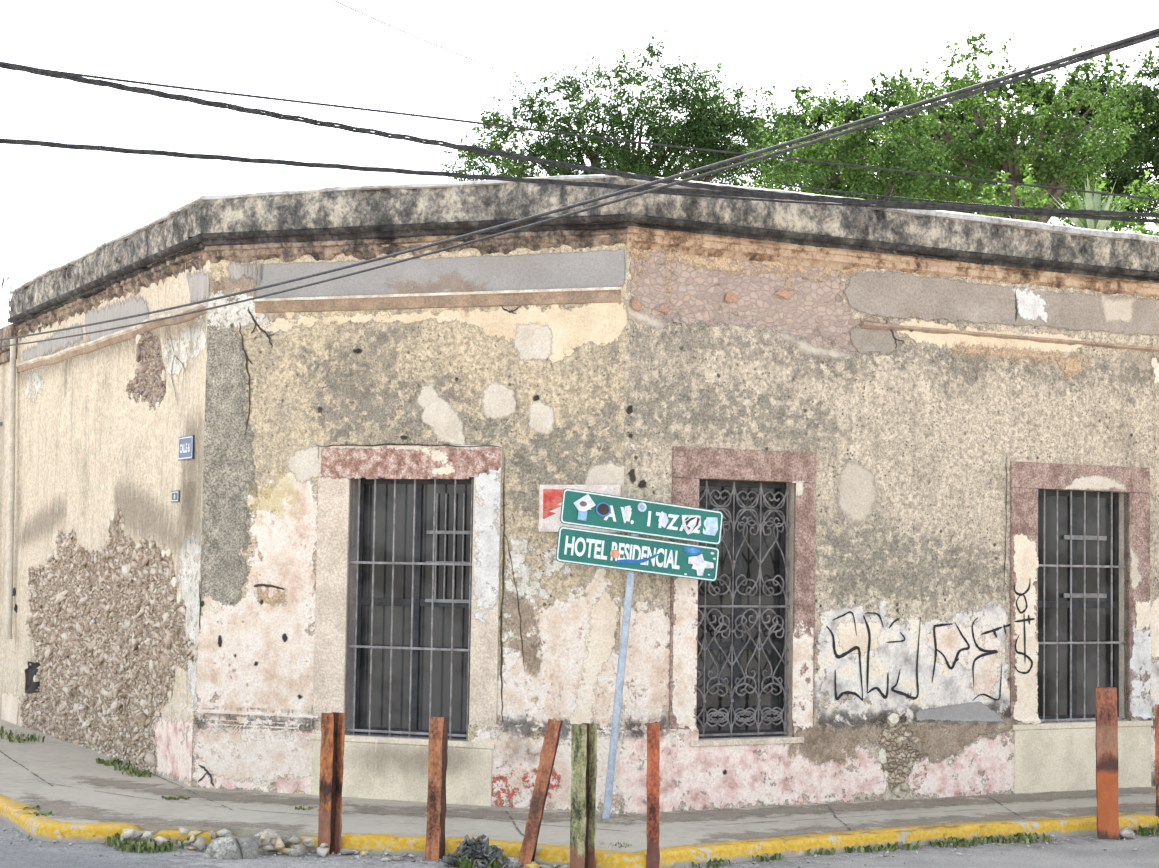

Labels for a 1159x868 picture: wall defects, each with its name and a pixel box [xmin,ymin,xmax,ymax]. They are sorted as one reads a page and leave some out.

flaking render [627,248,895,357]
flaking render [124,331,166,410]
crack [239,308,274,436]
flaking render [1,446,1041,814]
peeling [1130,544,1159,781]